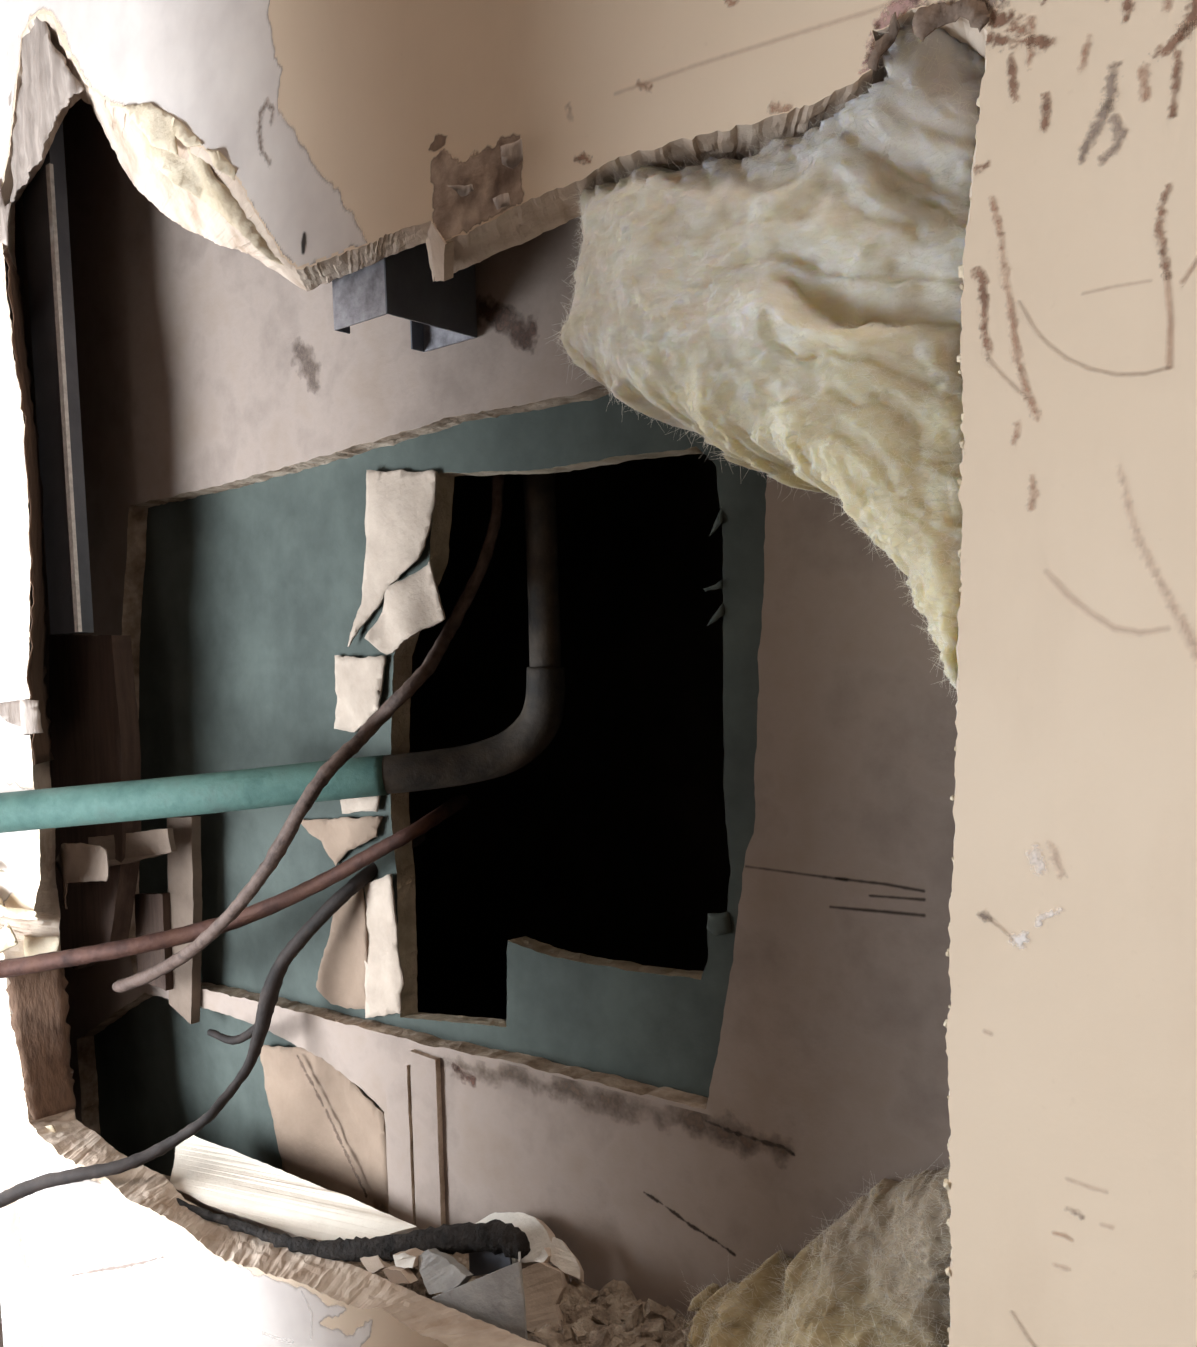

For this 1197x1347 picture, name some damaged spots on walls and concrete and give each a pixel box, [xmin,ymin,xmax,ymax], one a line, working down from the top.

peeling [0,0,367,267]
peeling [0,263,44,793]
peeling [0,830,40,953]
water stain [452,1064,476,1087]
peeling [0,978,372,1347]
flaking render [360,1248,474,1295]
flaking render [476,1212,584,1334]